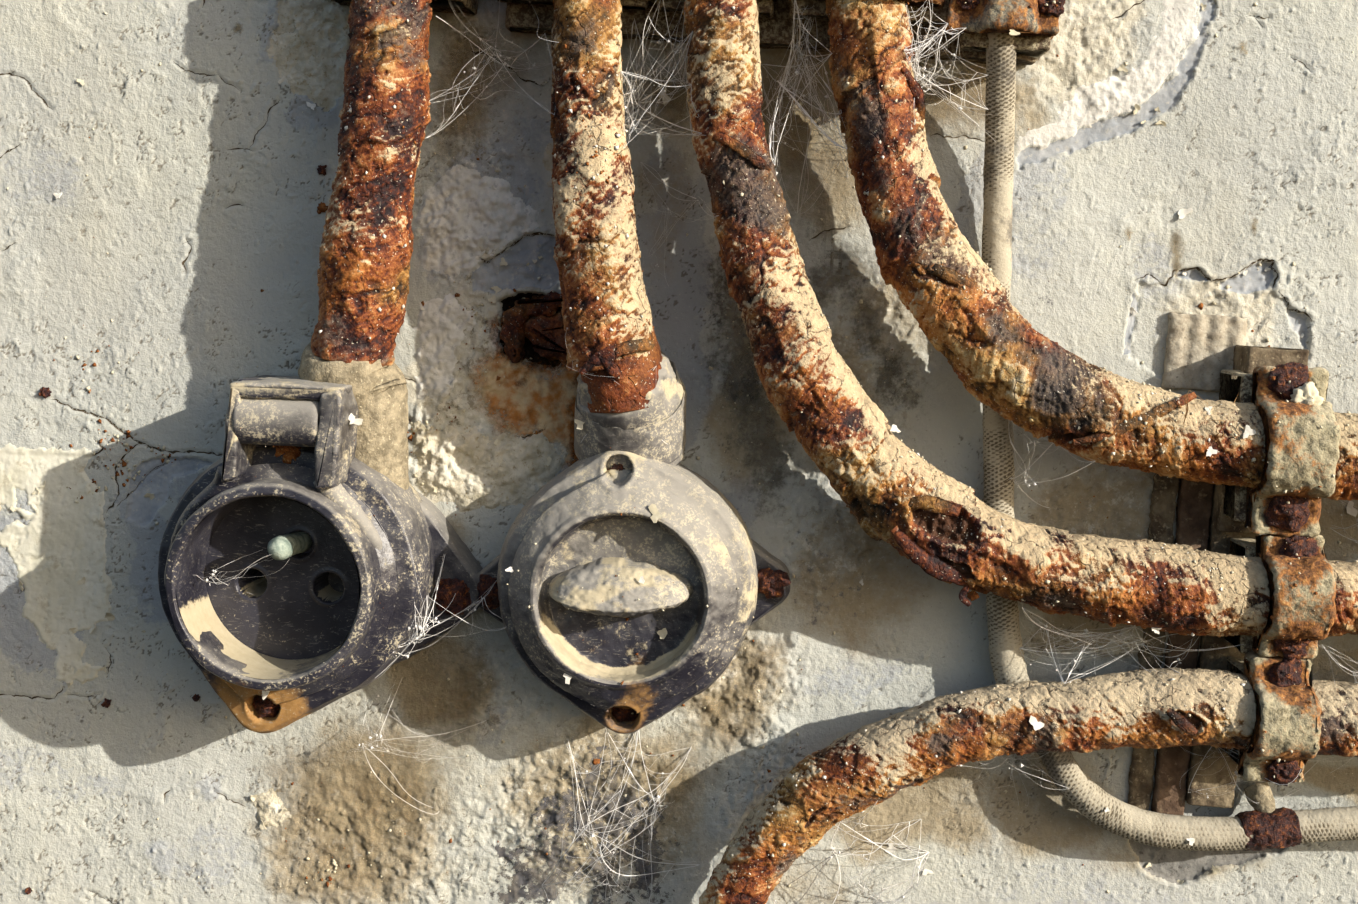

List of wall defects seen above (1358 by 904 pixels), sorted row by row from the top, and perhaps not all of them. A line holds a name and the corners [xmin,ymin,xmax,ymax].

spalling [266,0,350,112]
peeling [1016,0,1216,170]
rust [474,318,580,466]
spalling [1176,262,1274,294]
spalling [1287,309,1309,350]
peeling [0,443,115,688]